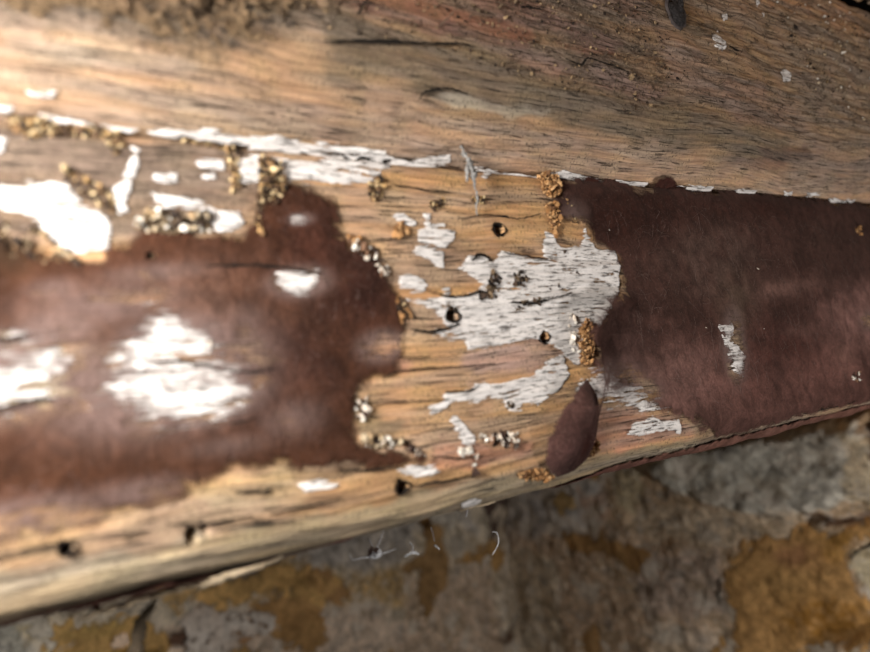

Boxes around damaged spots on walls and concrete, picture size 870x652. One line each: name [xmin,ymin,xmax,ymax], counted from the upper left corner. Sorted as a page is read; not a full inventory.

peeling [0,181,112,253]
peeling [113,146,141,214]
peeling [151,192,245,233]
peeling [39,113,452,185]
peeling [393,213,456,268]
peeling [275,268,319,296]
peeling [0,329,74,416]
peeling [100,314,250,422]
peeling [398,228,682,445]
peeling [397,464,441,478]
flaking render [711,516,870,652]
crack [849,544,870,558]